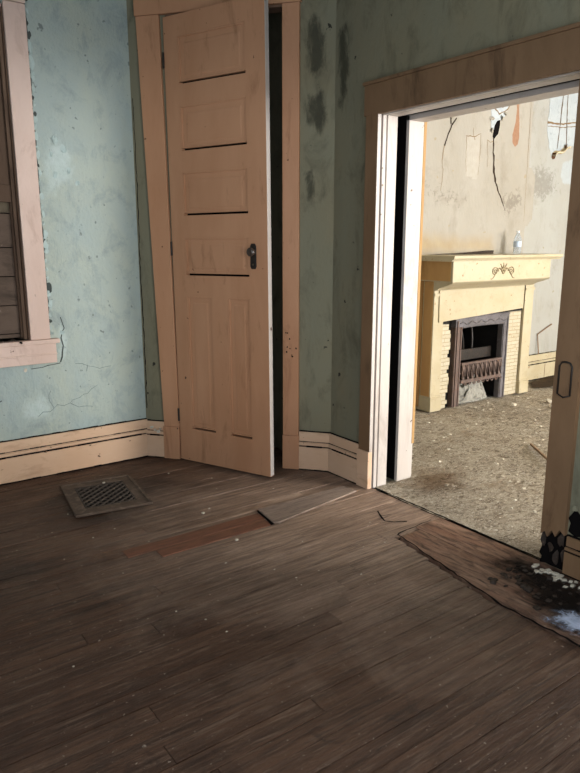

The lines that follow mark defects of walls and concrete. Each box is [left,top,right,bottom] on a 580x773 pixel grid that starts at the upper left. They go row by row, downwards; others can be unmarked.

crack [440,117,457,191]
crack [487,137,505,210]
leakage [495,558,580,630]